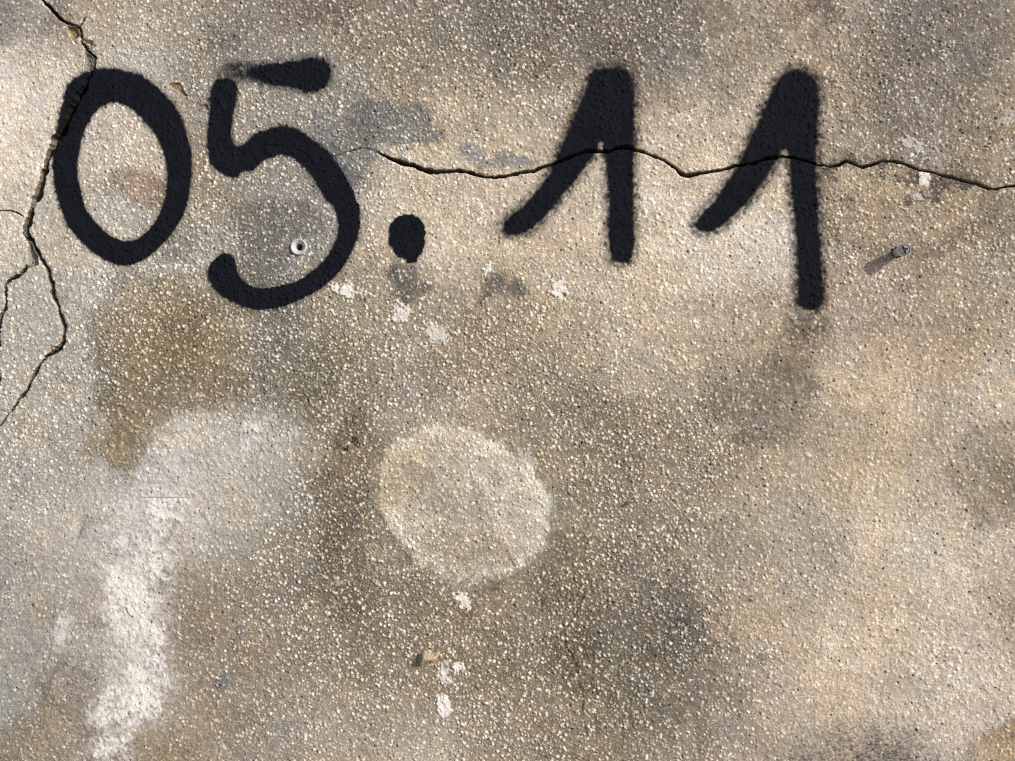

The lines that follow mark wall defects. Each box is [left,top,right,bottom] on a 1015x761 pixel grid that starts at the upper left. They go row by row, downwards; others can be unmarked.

crack [0,0,97,427]
crack [242,144,1015,191]
damp [0,478,204,761]